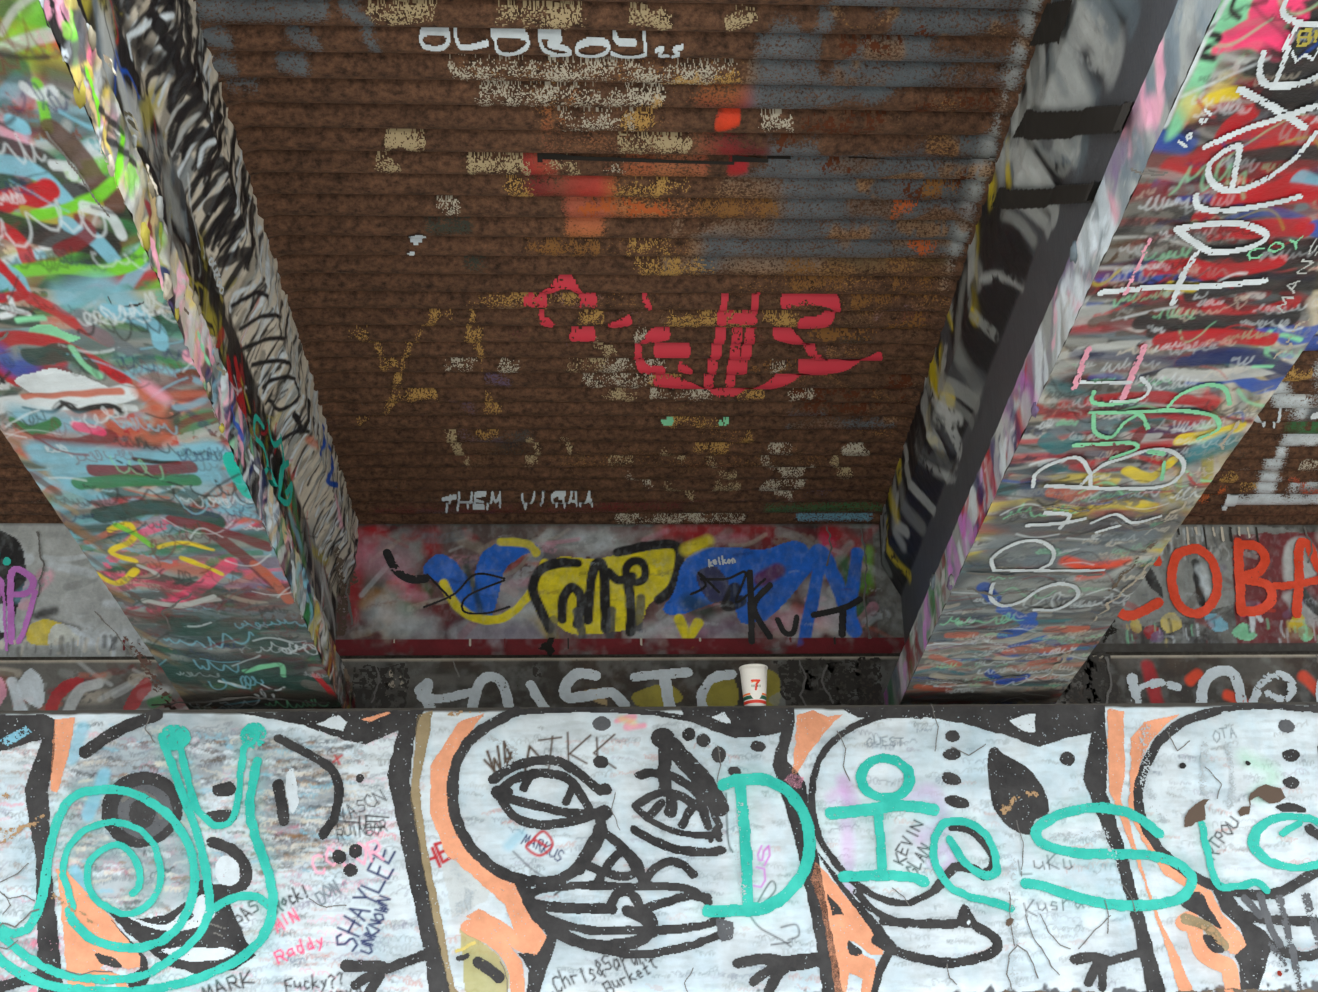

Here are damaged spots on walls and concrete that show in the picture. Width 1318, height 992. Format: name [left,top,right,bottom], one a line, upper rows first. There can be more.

corrosion [839,25,936,57]
corrosion [902,169,977,200]
corrosion [578,197,678,219]
corrosion [807,311,926,344]